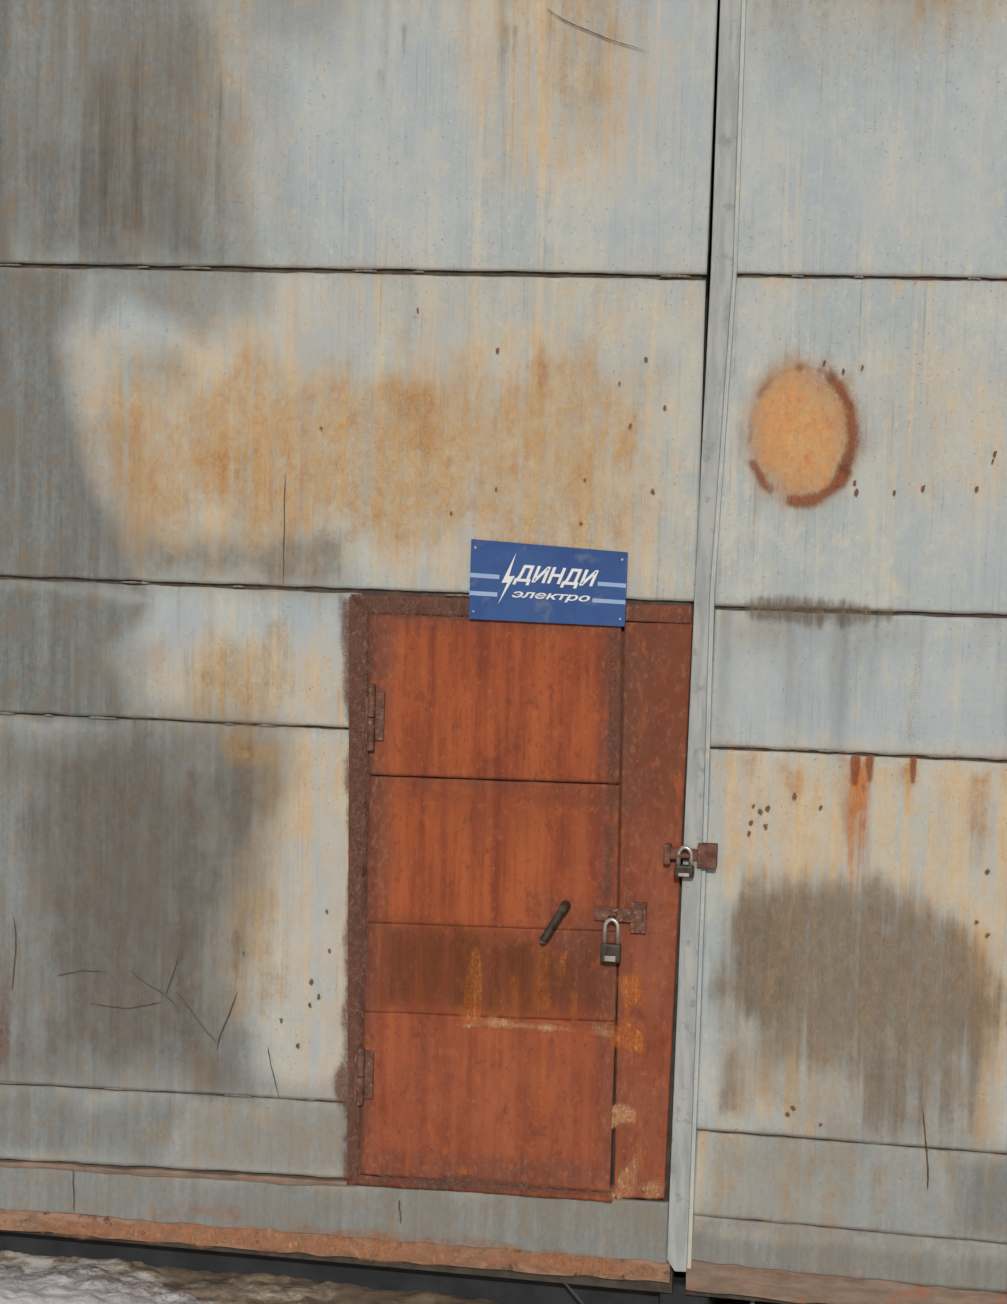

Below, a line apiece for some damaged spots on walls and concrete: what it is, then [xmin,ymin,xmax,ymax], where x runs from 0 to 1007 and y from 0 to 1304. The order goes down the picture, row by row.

rust [131,359,357,513]
rust [751,360,859,506]
rust [849,755,874,840]
rust [611,976,645,1052]
leakage [720,879,1001,1116]
rust [42,1210,651,1276]